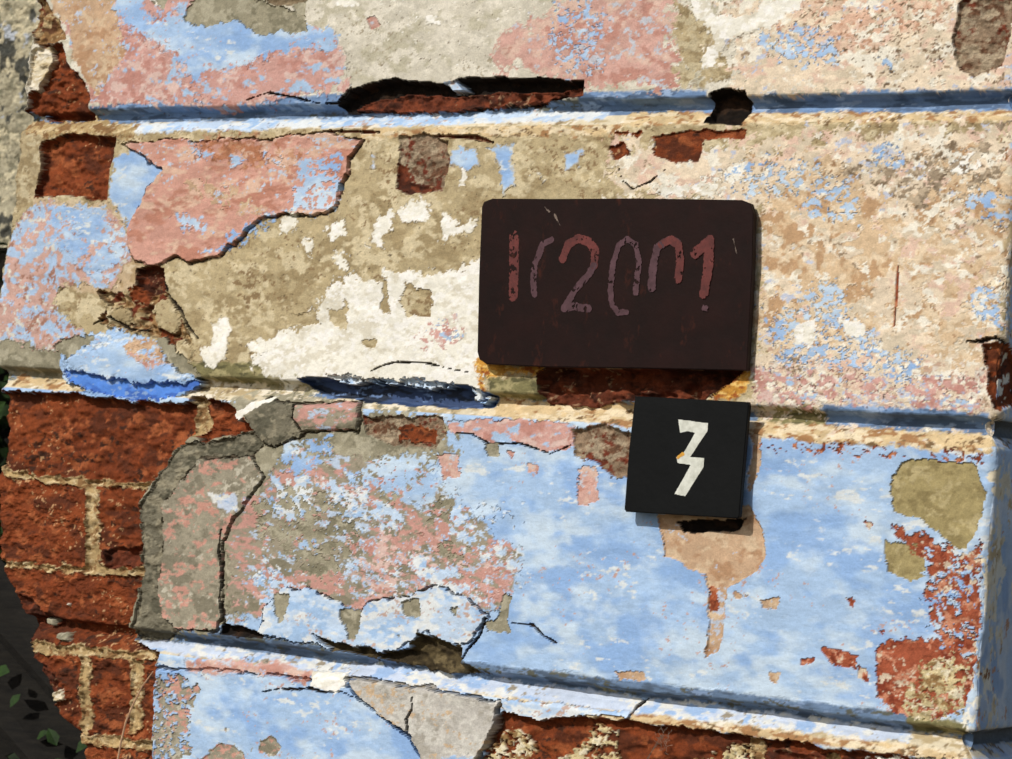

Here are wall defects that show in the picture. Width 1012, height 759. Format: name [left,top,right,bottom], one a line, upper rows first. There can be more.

peeling [26,0,607,122]
peeling [689,0,843,70]
spalling [952,0,1012,77]
peeling [0,126,946,759]
crack [218,528,226,621]
peeling [801,445,988,721]